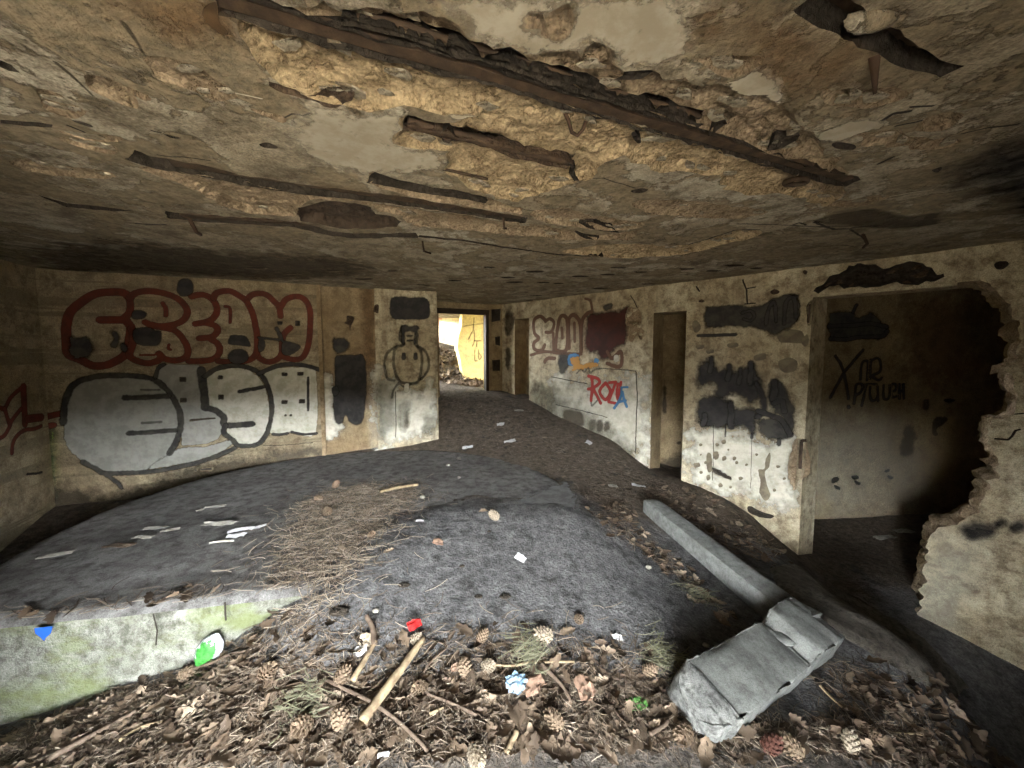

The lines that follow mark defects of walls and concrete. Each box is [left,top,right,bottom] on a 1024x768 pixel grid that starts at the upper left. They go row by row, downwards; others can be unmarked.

spalling [35,0,963,301]